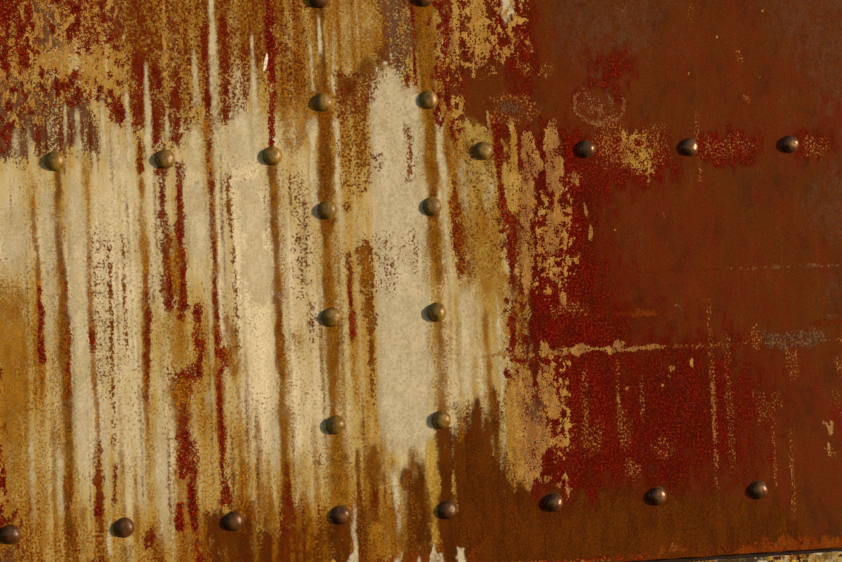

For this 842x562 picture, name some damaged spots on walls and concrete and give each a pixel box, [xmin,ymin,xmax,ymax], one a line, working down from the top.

rust [0,0,476,562]
rust [483,0,542,109]
peeling [425,0,602,507]
rust [422,100,842,562]